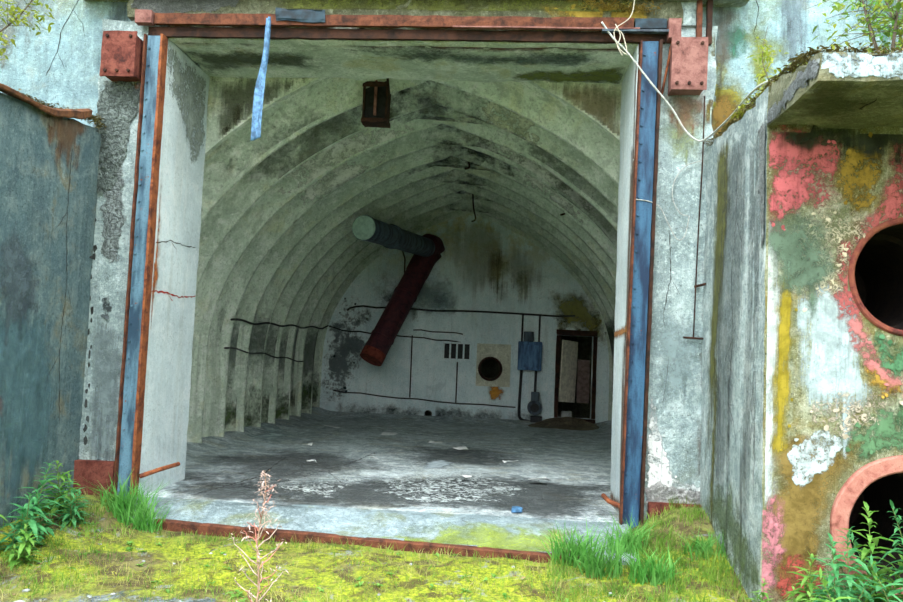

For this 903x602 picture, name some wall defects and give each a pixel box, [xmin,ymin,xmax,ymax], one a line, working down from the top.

leakage [220,80,290,135]
corrosion [48,114,95,167]
crack [152,290,195,301]
peeling [758,52,903,487]